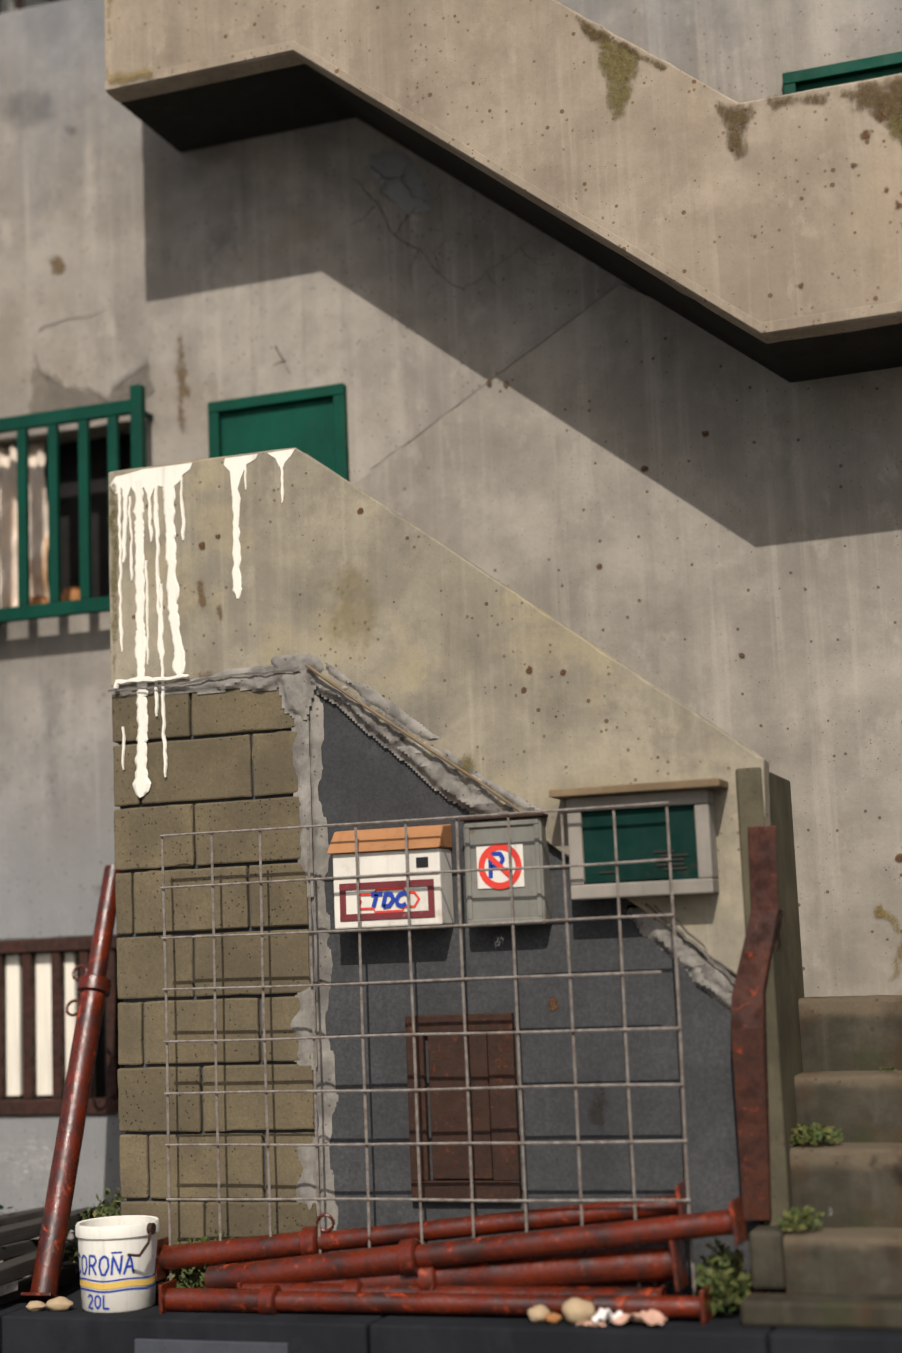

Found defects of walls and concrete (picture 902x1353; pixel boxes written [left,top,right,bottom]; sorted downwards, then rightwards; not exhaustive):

peeling [31,354,156,413]
damp [232,463,247,599]
damp [113,477,190,798]
damp [197,581,222,619]
spalling [108,653,541,1231]